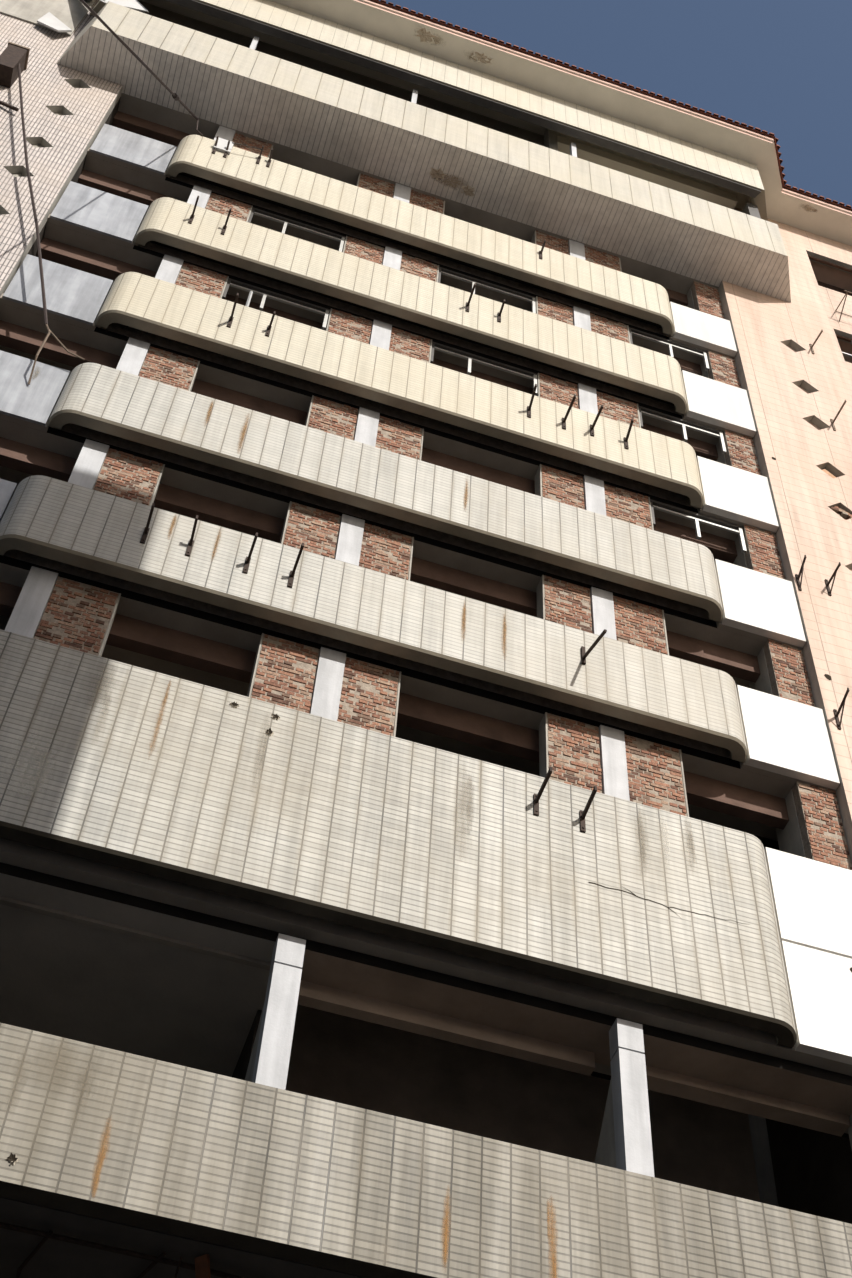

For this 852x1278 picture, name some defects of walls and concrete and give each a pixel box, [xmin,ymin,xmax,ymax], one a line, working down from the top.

corrosion [548,1208,556,1278]